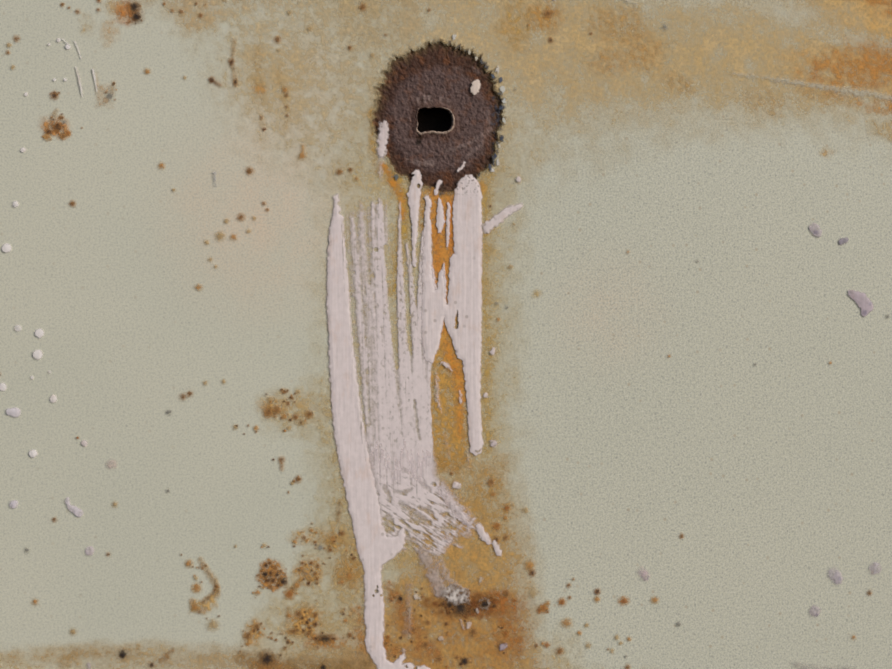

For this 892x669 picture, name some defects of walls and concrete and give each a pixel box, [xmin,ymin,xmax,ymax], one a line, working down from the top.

corrosion [42,114,71,140]
corrosion [97,0,142,24]
corrosion [333,162,455,353]
peeling [372,34,507,194]
corrosion [479,174,491,216]
corrosion [163,0,892,164]
corrosion [264,389,312,432]
corrosion [381,273,574,669]
corrosion [181,554,220,628]
corrosion [240,488,377,669]